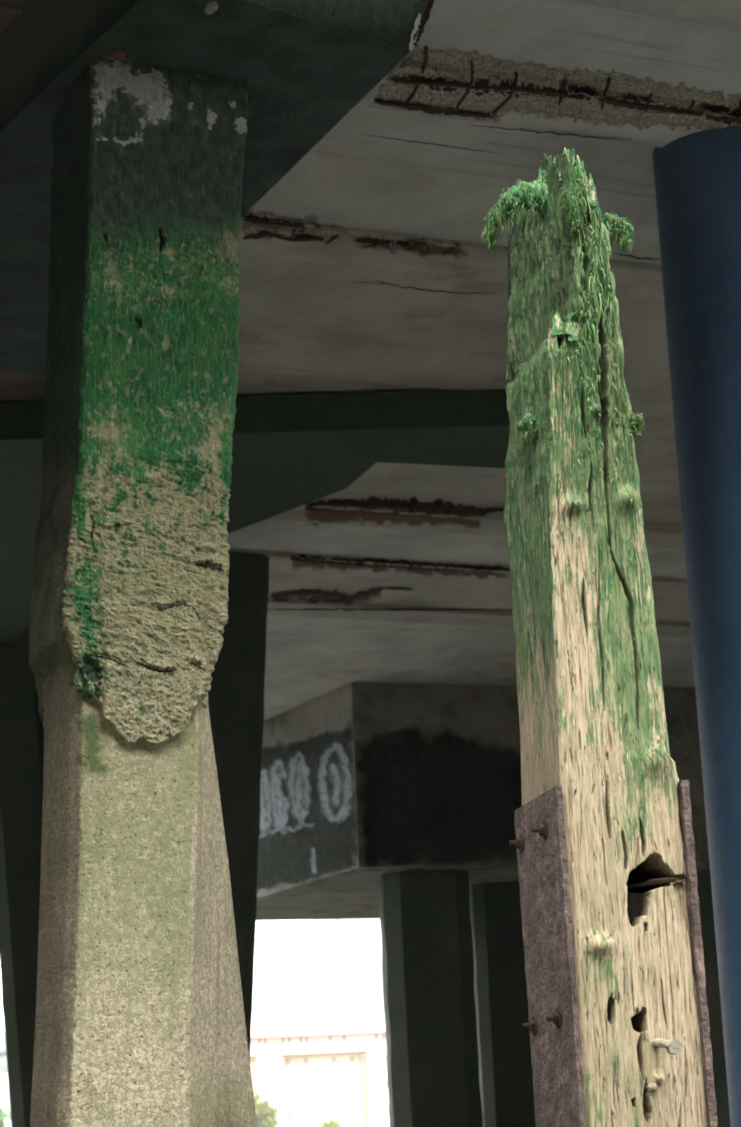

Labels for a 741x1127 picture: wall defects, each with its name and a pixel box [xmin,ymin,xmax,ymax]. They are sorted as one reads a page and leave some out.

peeling [90,60,173,146]
peeling [201,108,218,130]
peeling [228,101,247,134]
spalling [374,44,741,131]
spalling [243,211,462,257]
spalling [305,496,504,528]
spalling [290,554,510,579]
spalling [271,587,414,604]